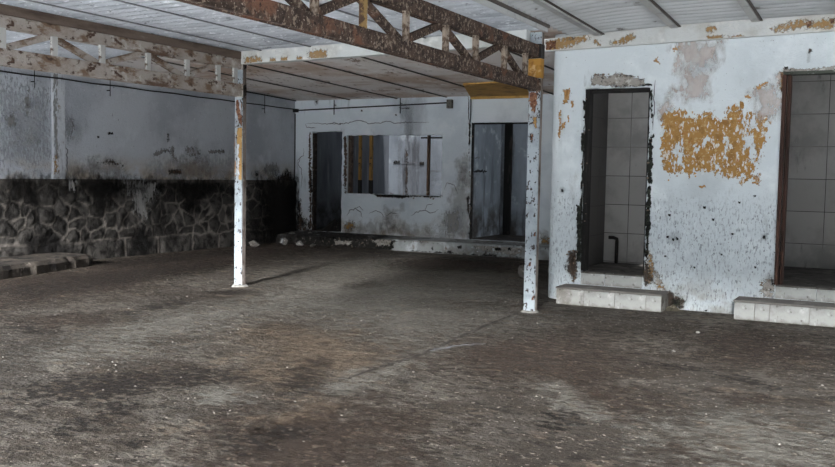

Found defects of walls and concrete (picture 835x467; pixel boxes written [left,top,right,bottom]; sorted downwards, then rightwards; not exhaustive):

corrosion [244,49,327,63]
water stain [1,73,233,221]
crack [305,107,426,128]
corrosion [528,91,538,140]
peeling [558,88,574,138]
peeling [591,66,835,197]
water stain [576,99,588,262]
crack [347,204,439,217]
water stain [656,282,686,309]
crack [322,313,518,387]